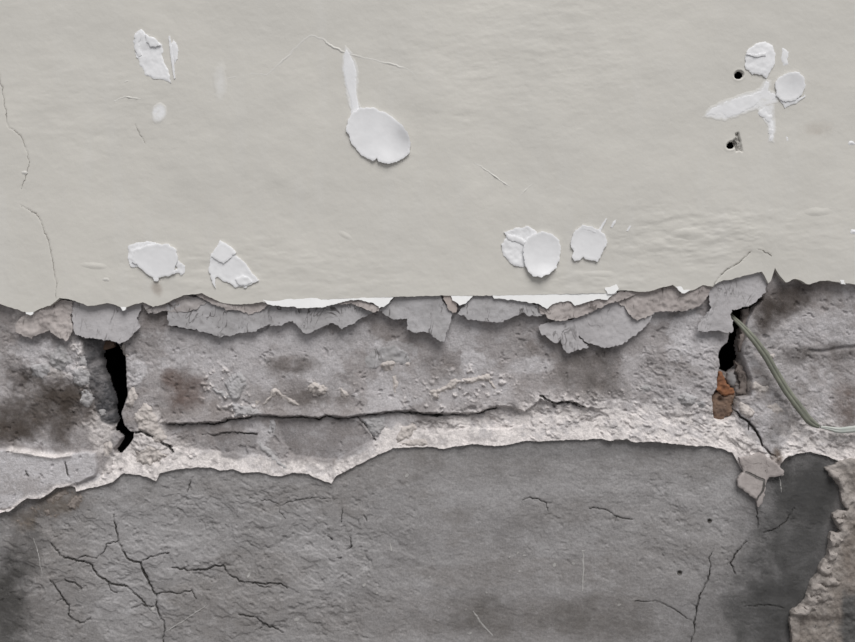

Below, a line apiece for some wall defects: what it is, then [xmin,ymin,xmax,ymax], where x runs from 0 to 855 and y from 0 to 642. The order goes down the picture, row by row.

crack [136,411,458,452]
spalling [0,272,855,642]
crack [50,516,287,642]
crack [640,541,747,641]